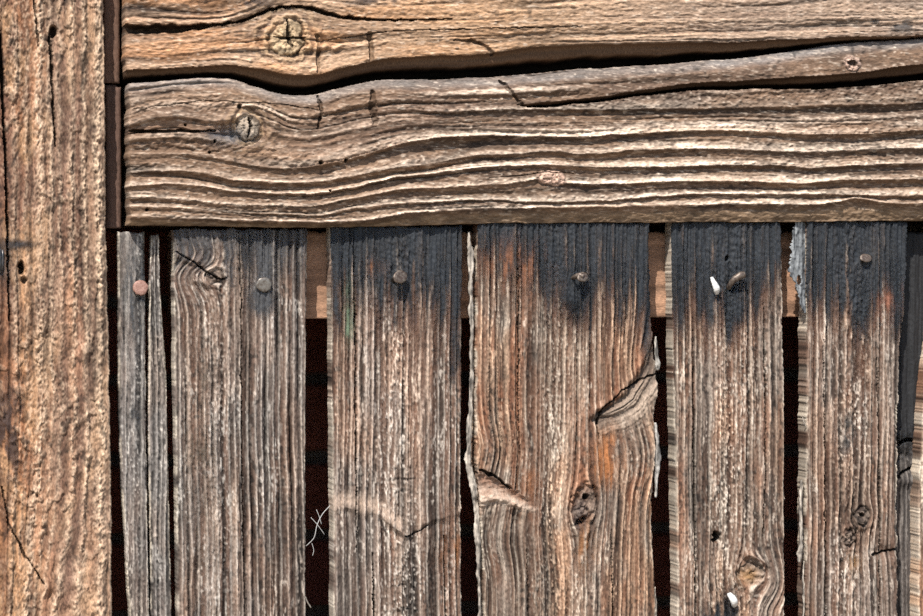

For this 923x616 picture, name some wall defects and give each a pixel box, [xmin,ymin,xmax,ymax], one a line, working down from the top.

crack [32,0,57,148]
crack [847,59,858,67]
crack [0,0,11,322]
crack [595,373,655,439]
crack [479,469,513,490]
crack [1,486,46,585]